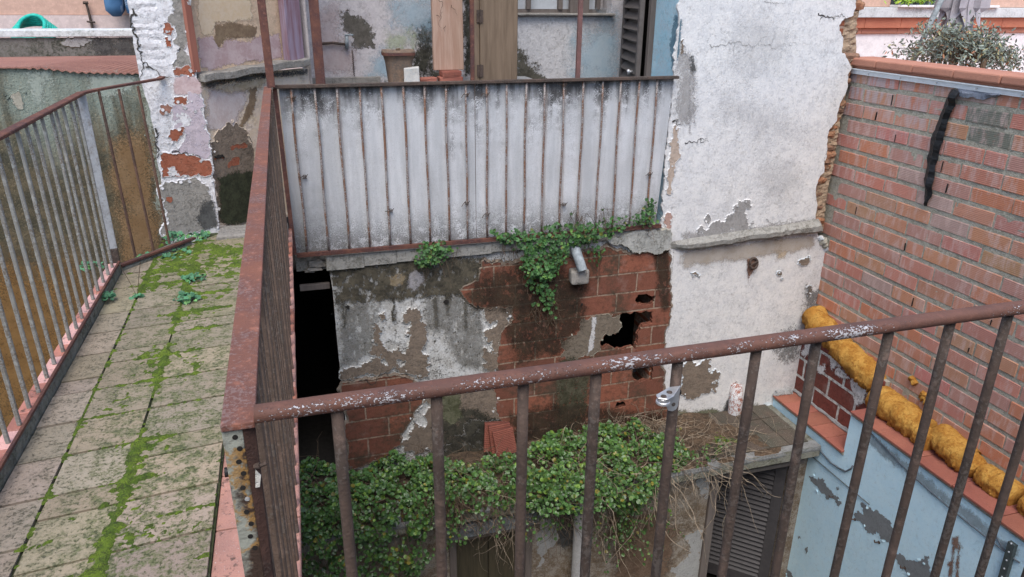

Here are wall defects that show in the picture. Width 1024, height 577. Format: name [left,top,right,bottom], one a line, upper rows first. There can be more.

damp [336,0,439,77]
flaking render [156,0,282,242]
spalling [816,0,865,252]
damp [193,169,253,231]
peeling [696,199,756,236]
flaking render [443,211,673,372]
peeling [336,306,431,393]
flaking render [344,365,667,470]
peeling [681,358,721,400]
peeling [809,474,842,506]
peeling [853,502,893,542]
peeling [895,553,931,577]